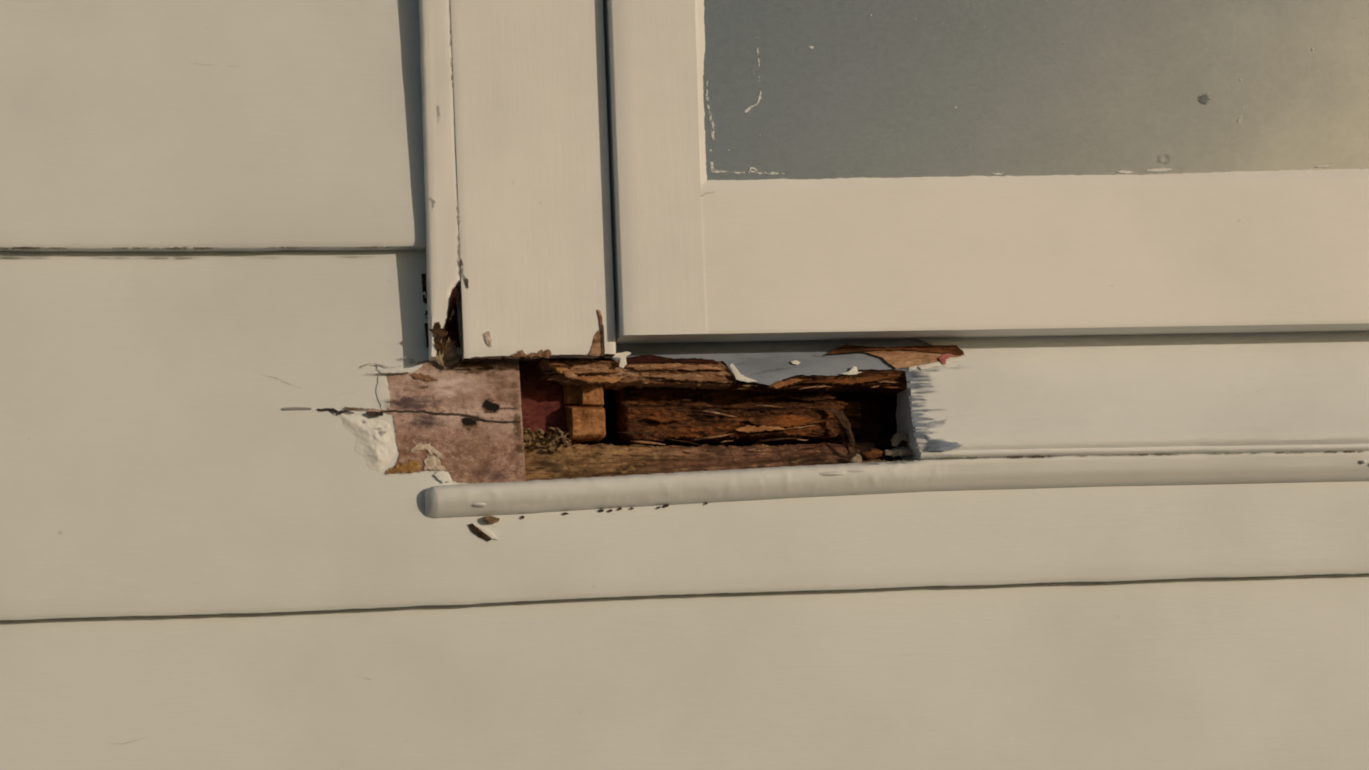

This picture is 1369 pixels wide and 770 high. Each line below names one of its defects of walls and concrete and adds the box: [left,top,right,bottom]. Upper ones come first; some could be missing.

crack [362,357,417,375]
peeling [613,351,631,368]
peeling [730,363,757,382]
peeling [826,345,966,375]
peeling [367,286,551,484]
crack [282,407,521,423]